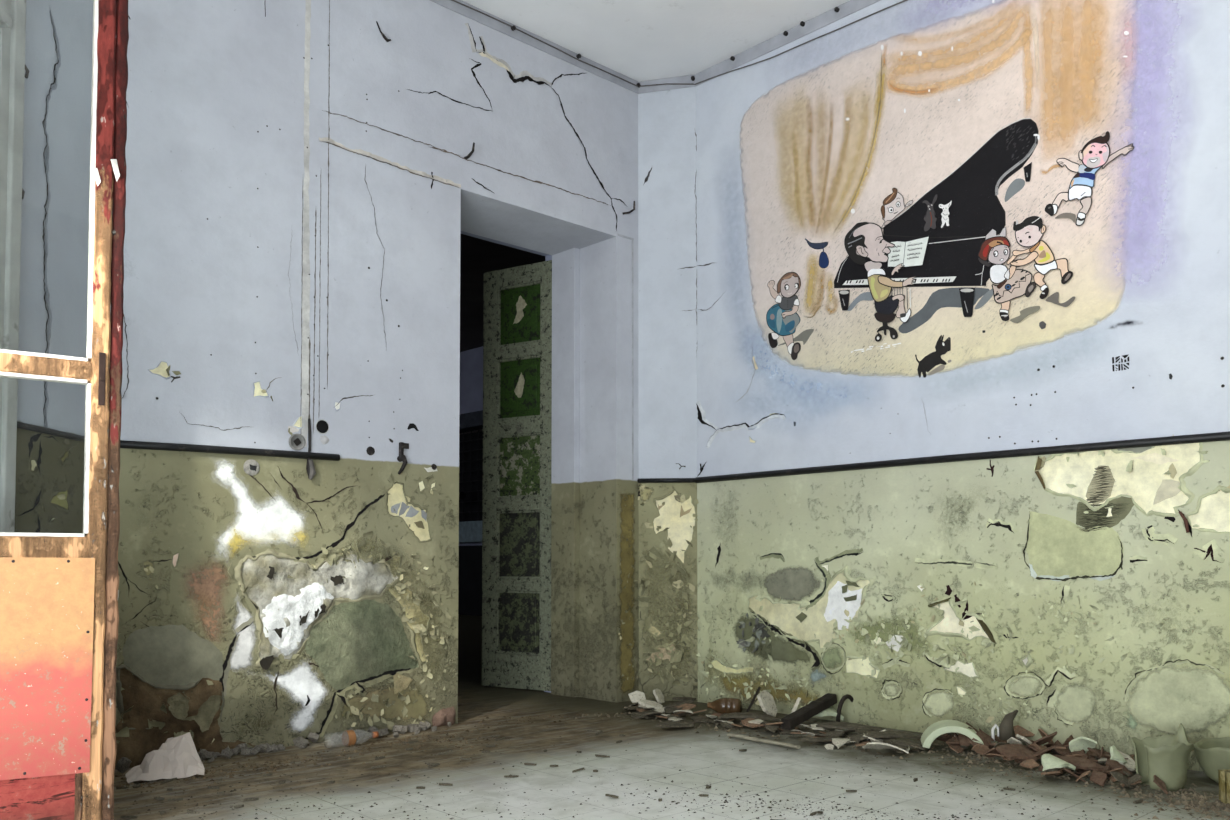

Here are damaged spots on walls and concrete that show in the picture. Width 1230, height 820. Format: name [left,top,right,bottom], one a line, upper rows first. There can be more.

crack [319,23,652,351]
peeling [147,361,181,380]
peeling [253,381,273,401]
crack [676,349,786,477]
peeling [1034,435,1230,533]
crack [118,559,172,627]
crack [219,469,385,696]
spalling [228,466,456,730]
peeling [618,483,1120,723]
crack [274,668,413,746]